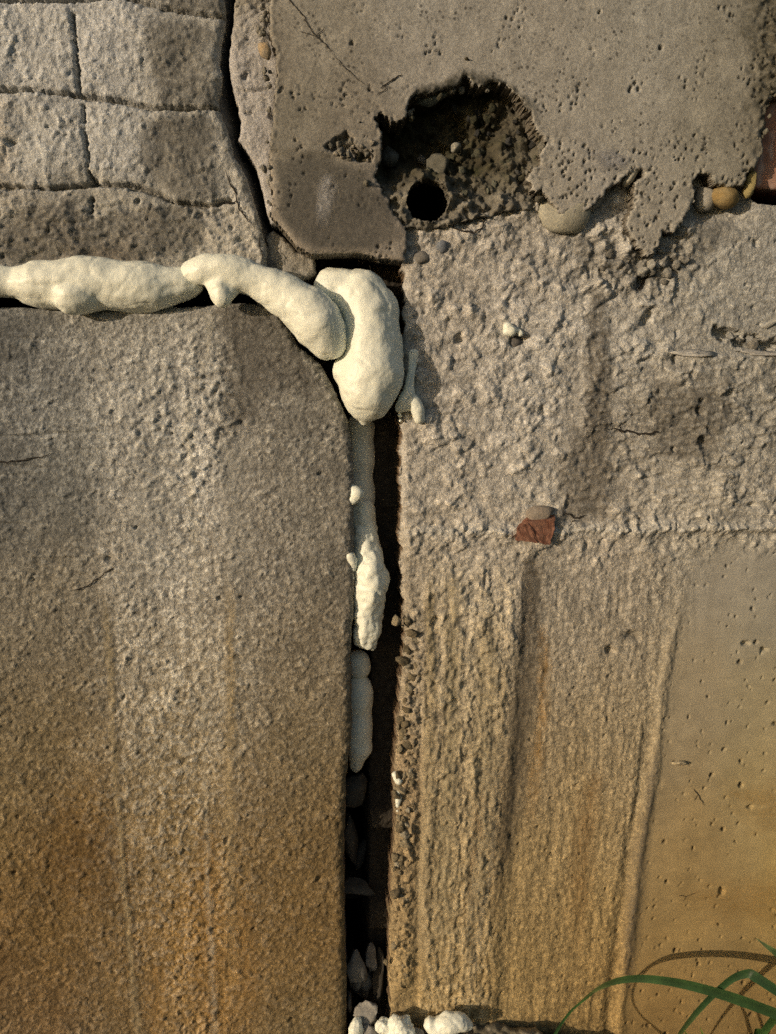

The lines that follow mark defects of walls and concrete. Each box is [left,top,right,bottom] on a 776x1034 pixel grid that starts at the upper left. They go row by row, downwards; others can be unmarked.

spalling [328,80,547,232]
damp [417,600,457,918]
damp [469,568,539,941]